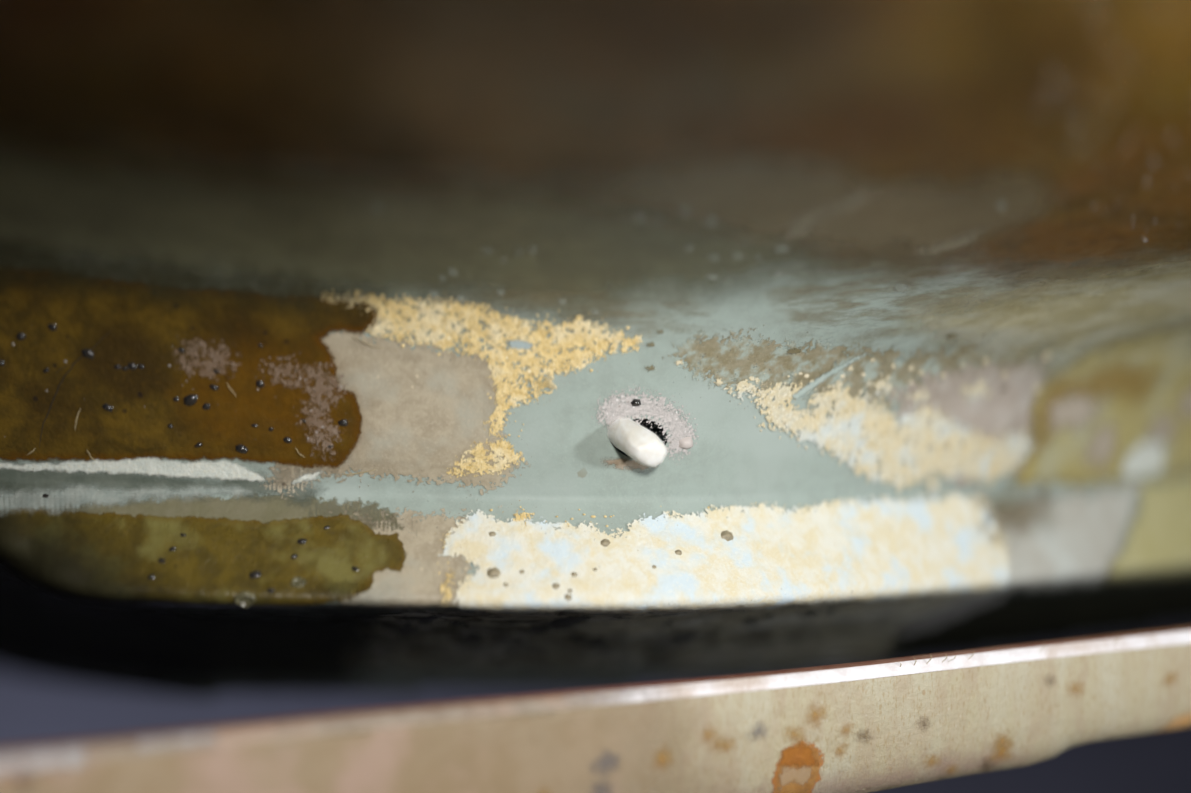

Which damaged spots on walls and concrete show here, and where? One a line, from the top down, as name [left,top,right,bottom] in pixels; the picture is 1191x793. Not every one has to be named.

peeling [321,290,643,479]
water stain [0,493,1191,691]
peeling [437,370,1140,637]
corrosion [771,731,823,793]